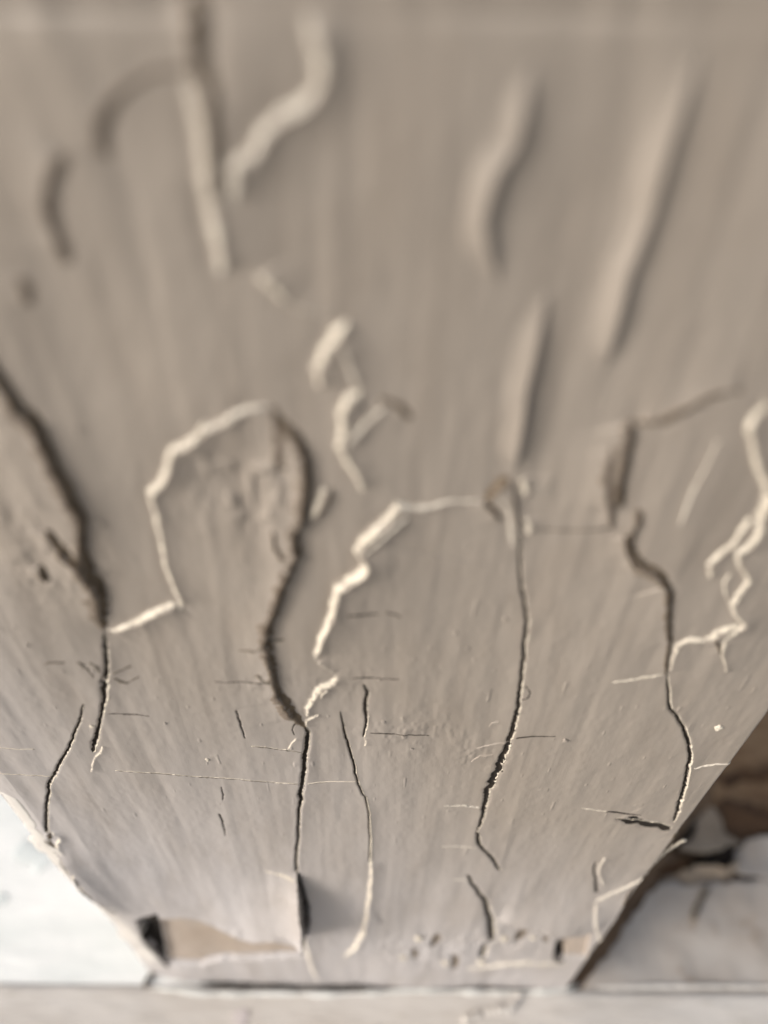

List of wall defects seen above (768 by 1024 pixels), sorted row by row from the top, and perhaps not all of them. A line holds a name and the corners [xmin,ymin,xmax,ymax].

peeling [257,276,412,491]
peeling [108,405,269,632]
crack [0,371,429,980]
peeling [304,476,531,726]
crack [475,526,555,871]
crack [598,389,742,831]
peeling [669,397,768,672]
peeling [0,792,80,892]
peeling [92,901,298,968]
crack [467,874,497,958]